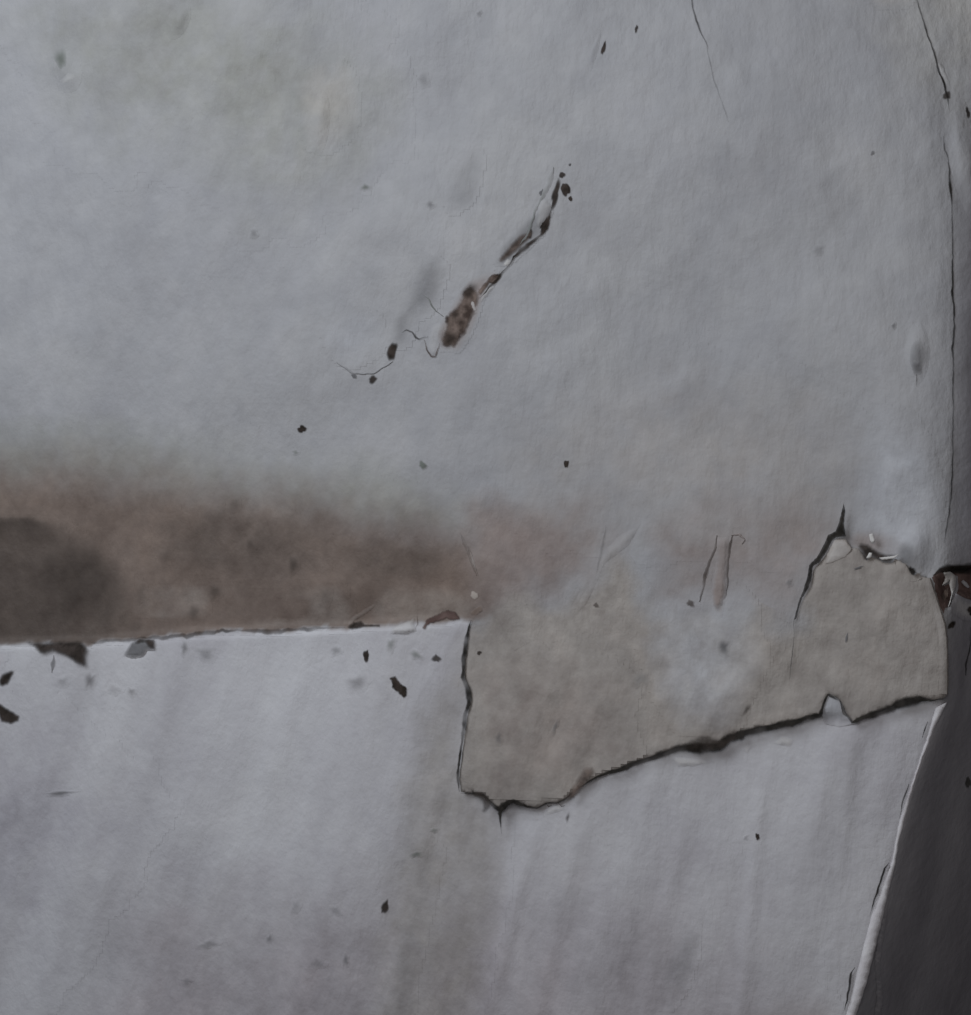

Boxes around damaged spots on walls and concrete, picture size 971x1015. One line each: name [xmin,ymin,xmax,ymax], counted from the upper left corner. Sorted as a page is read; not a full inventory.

crack [918,4,950,99]
crack [944,146,952,203]
crack [949,238,957,384]
crack [946,457,954,525]
flaking render [345,603,379,628]
peeling [341,650,372,693]
water stain [0,336,949,1015]
flaking render [385,524,971,808]